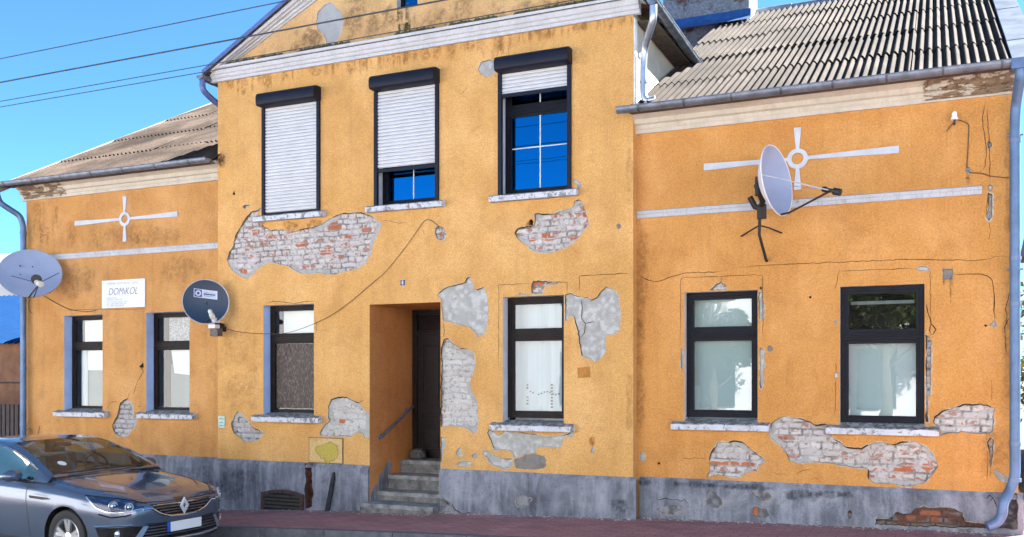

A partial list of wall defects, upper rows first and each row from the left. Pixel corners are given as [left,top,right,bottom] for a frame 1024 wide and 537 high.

flaking render [226,204,382,279]
flaking render [515,179,591,253]
crack [498,102,1009,354]
flaking render [437,277,489,337]
flaking render [518,280,621,378]
flaking render [112,398,138,438]
flaking render [320,396,369,439]
flaking render [440,338,574,471]
flaking render [708,440,765,479]
flaking render [768,416,938,488]
flaking render [924,334,1009,483]
flaking render [875,493,1019,530]